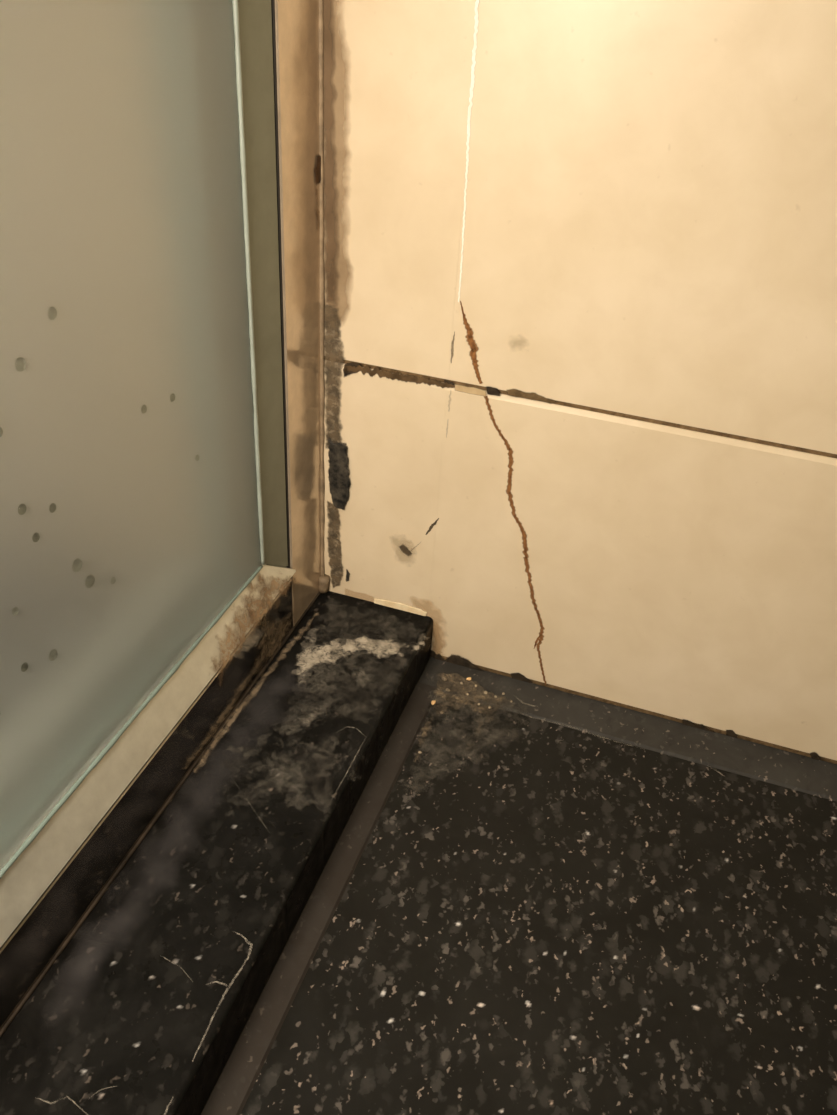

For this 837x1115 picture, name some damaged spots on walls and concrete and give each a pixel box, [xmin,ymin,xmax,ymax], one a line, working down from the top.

leakage [323,0,351,588]
crack [460,301,546,685]